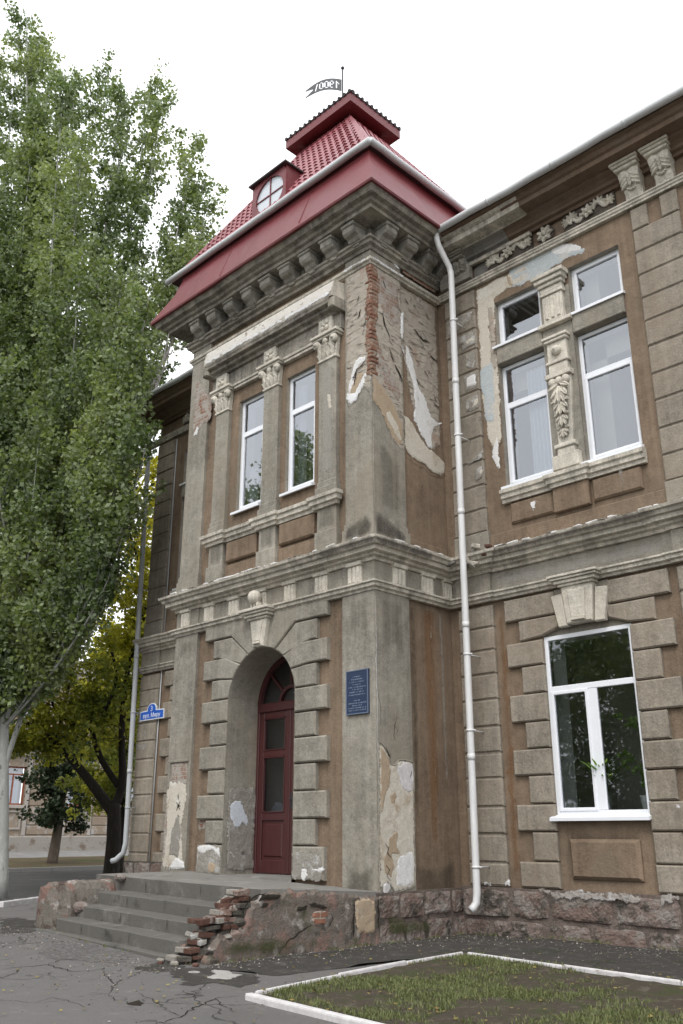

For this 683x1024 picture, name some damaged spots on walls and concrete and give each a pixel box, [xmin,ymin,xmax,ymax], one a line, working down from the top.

flaking render [193,381,212,437]
flaking render [204,243,585,481]
peeling [162,759,256,874]
peeling [291,852,325,882]
peeling [378,741,416,893]
spalling [165,888,281,964]